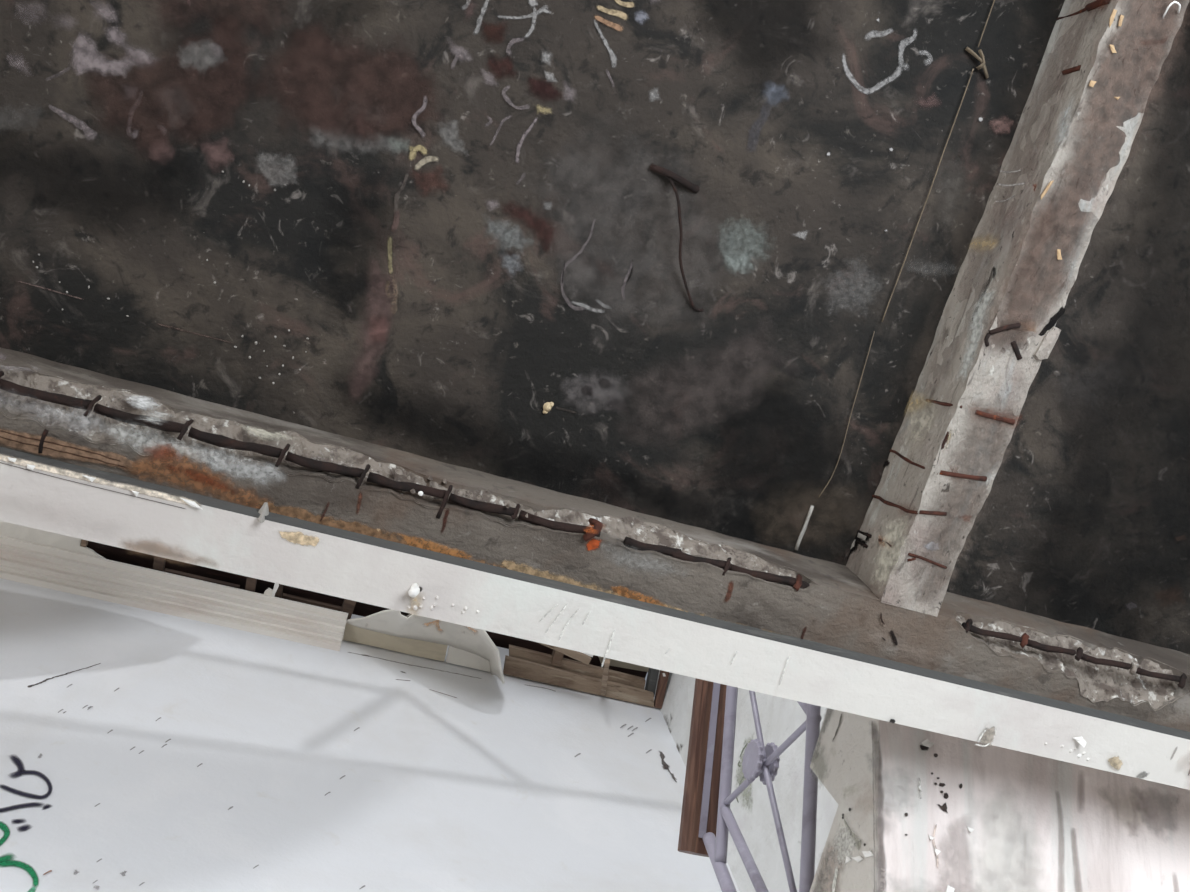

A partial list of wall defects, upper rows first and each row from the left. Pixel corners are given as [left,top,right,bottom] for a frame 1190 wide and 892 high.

rust [1056,0,1110,21]
rust [975,410,1015,425]
rust [889,432,987,481]
spalling [0,368,814,591]
rust [0,428,704,616]
rust [872,495,947,516]
rust [907,553,947,569]
spalling [955,611,1190,711]
leakage [1108,757,1123,770]
leakage [842,808,866,850]